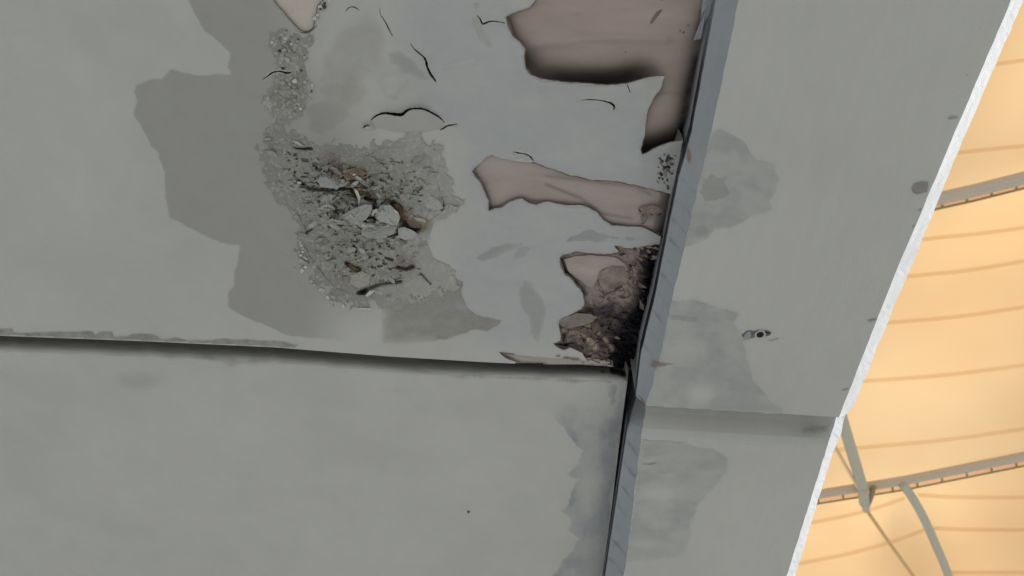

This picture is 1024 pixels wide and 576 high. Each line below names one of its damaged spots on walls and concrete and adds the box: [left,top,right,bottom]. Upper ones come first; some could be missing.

water stain [132,0,500,342]
spalling [254,0,465,311]
crack [413,47,436,81]
peeling [472,154,671,368]
peeling [506,0,712,155]